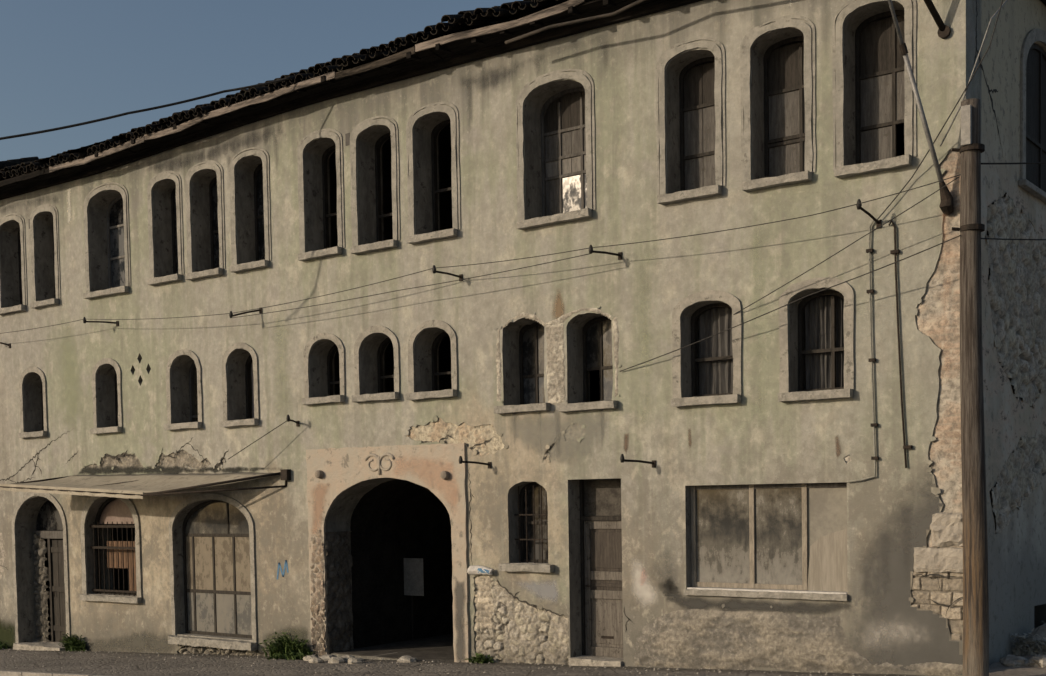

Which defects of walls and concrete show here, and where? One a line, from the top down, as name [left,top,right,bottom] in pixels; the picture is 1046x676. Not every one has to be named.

flaking render [986,191,1046,408]
crack [0,431,77,483]
flaking render [82,450,226,471]
crack [100,438,229,469]
flaking render [404,416,508,457]
flaking render [494,306,621,405]
spalling [909,150,963,640]
flaking render [471,575,569,665]
leakage [864,484,962,675]